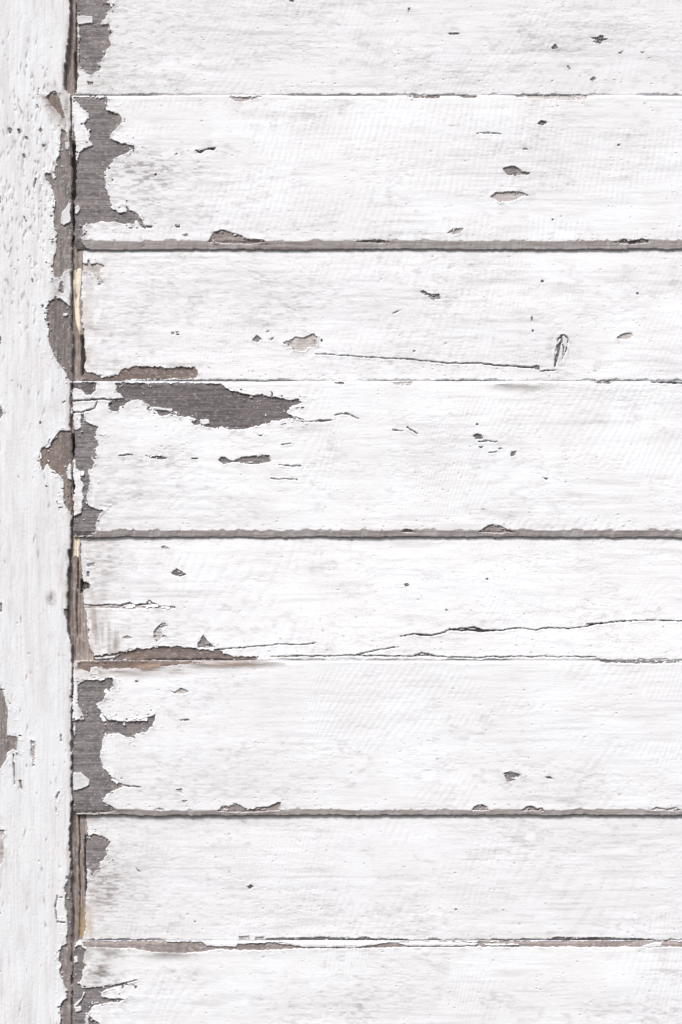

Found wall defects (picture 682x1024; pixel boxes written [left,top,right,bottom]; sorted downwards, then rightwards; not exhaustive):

peeling [37,0,332,436]
peeling [491,192,528,202]
crack [318,335,568,372]
peeling [38,412,103,537]
peeling [219,455,271,464]
crack [215,620,682,658]
peeling [61,623,257,813]
peeling [86,829,110,874]